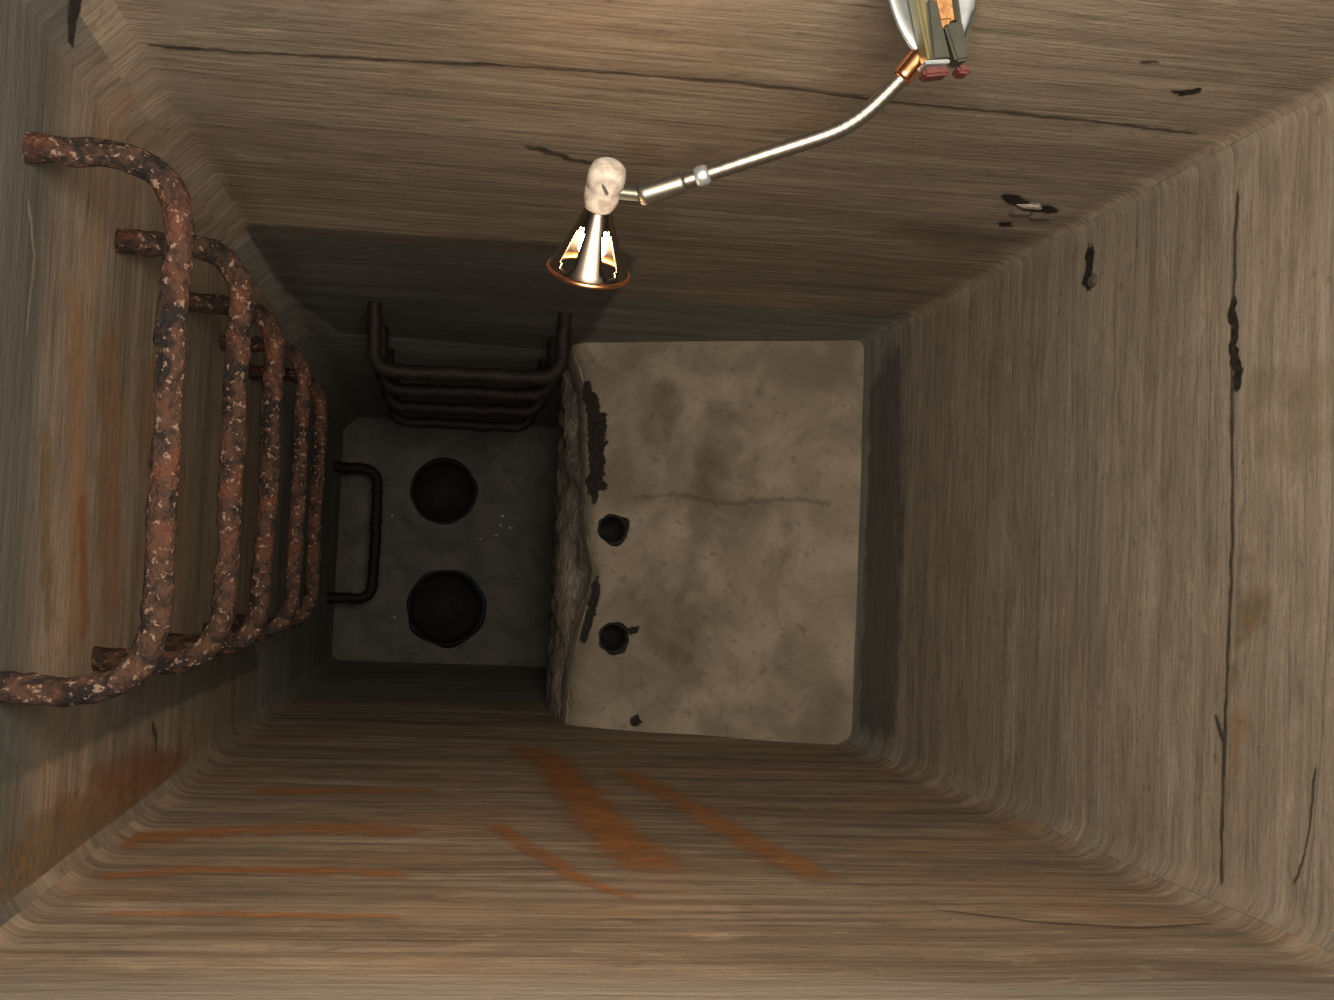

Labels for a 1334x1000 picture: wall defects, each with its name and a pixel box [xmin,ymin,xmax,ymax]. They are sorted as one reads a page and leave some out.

crack [149,44,1195,134]
crack [1215,192,1243,883]